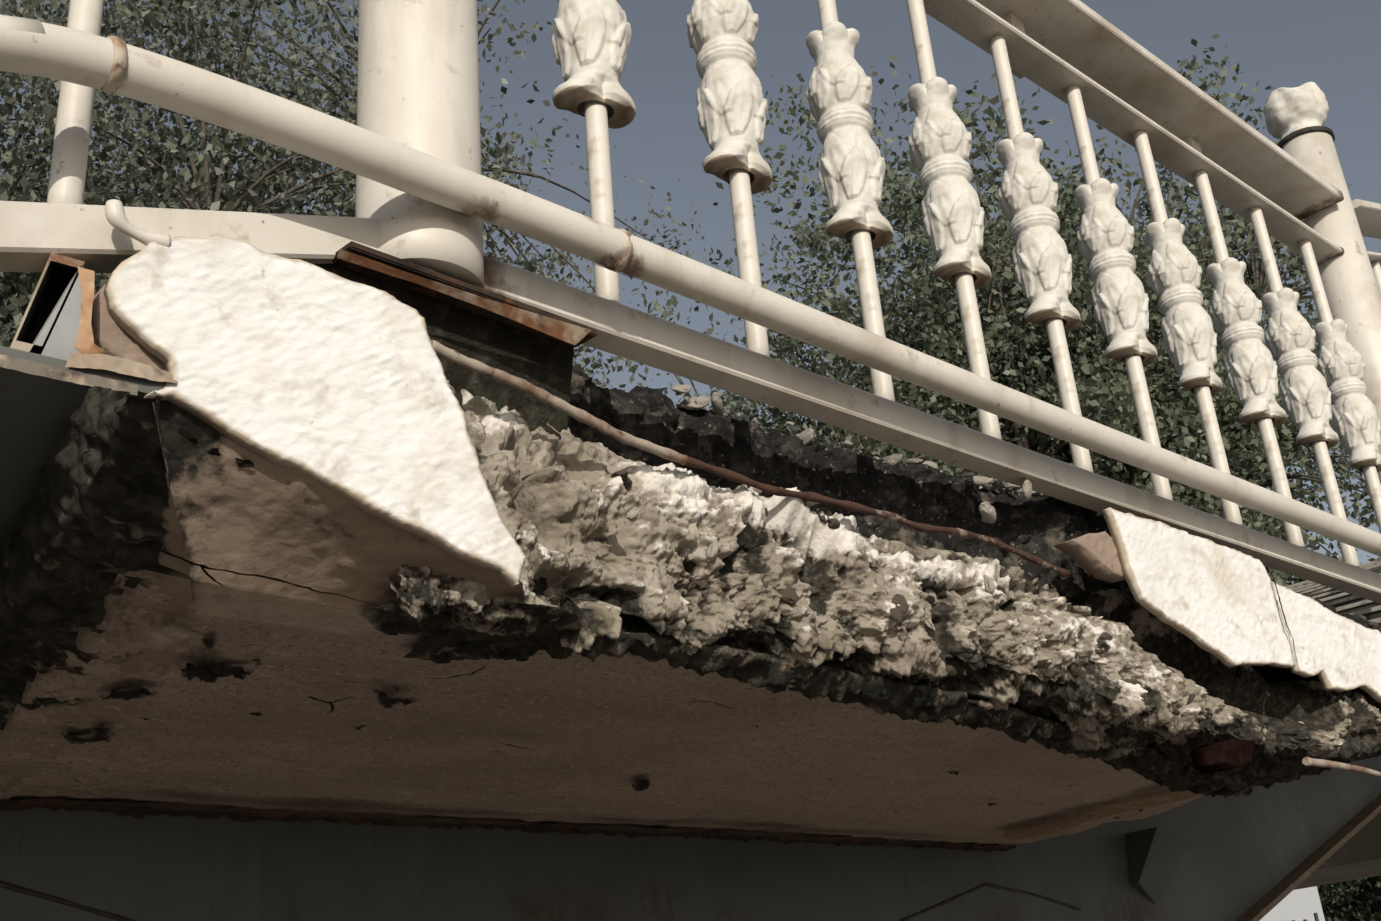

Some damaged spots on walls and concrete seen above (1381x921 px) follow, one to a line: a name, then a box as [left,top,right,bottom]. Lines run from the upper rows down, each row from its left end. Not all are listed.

rust [483,255,502,294]
crack [133,539,380,607]
spalling [359,340,1381,791]
spalling [100,687,156,700]
spalling [62,723,110,744]